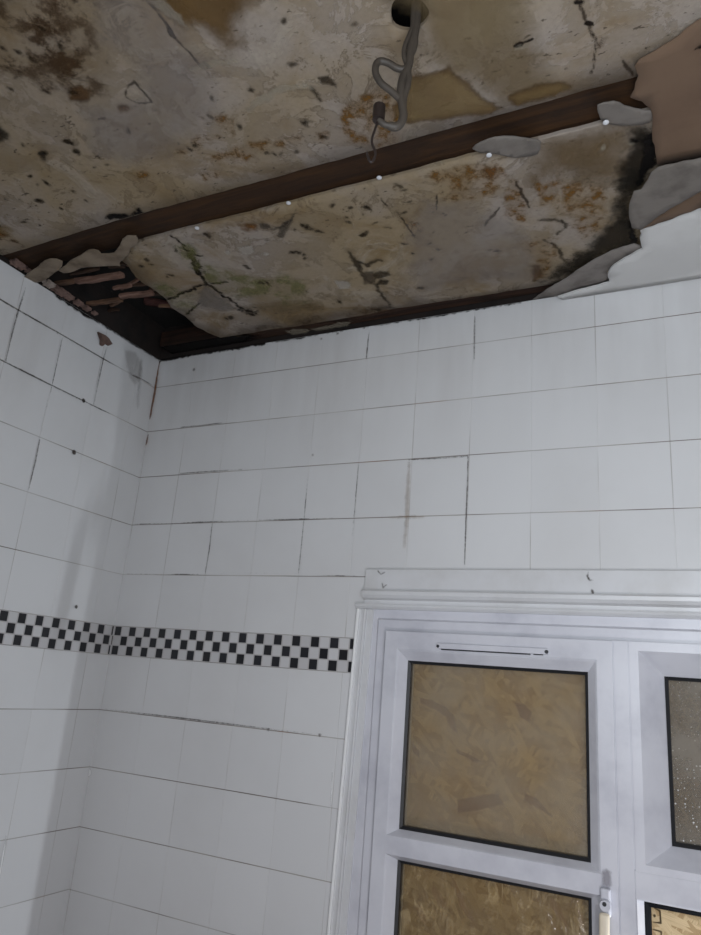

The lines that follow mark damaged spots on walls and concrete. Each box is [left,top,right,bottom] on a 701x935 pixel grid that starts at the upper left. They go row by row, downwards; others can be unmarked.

water stain [0,0,102,100]
water stain [152,0,248,43]
water stain [311,76,335,101]
water stain [341,0,571,147]
crack [574,0,600,72]
peeling [260,218,292,238]
water stain [535,127,650,282]
crack [167,235,257,316]
spalling [349,252,390,305]
spalling [533,243,642,300]